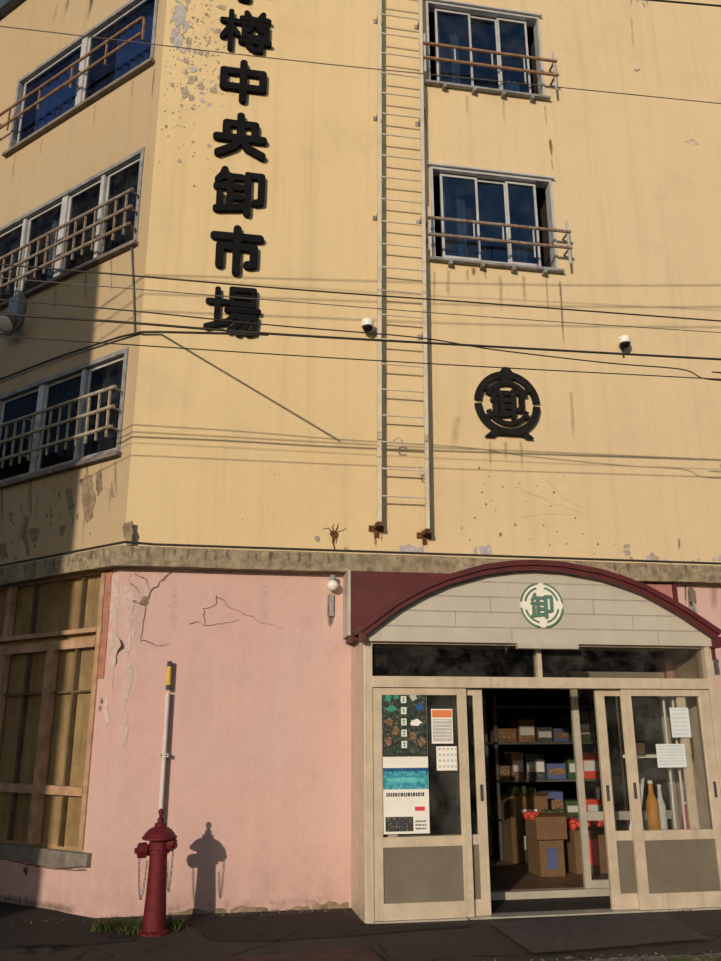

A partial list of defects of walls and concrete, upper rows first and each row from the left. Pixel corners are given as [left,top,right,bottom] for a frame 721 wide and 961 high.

peeling [161,0,234,172]
peeling [0,465,114,561]
corrosion [315,524,349,550]
crack [130,571,172,646]
crack [190,595,278,628]